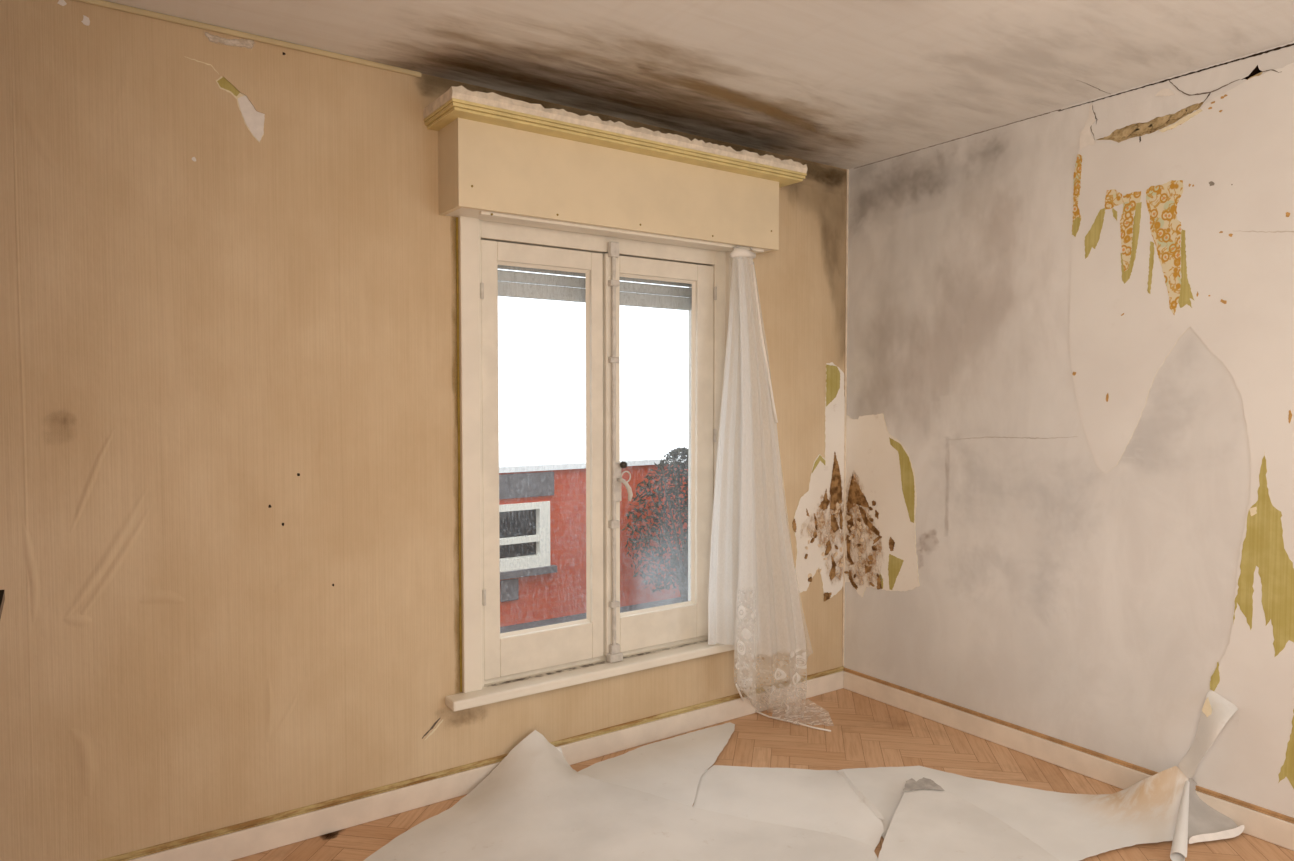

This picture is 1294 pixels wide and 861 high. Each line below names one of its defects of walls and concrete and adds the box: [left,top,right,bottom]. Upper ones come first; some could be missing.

peeling [217,77,265,142]
spalling [1097,94,1227,143]
peeling [794,362,920,598]